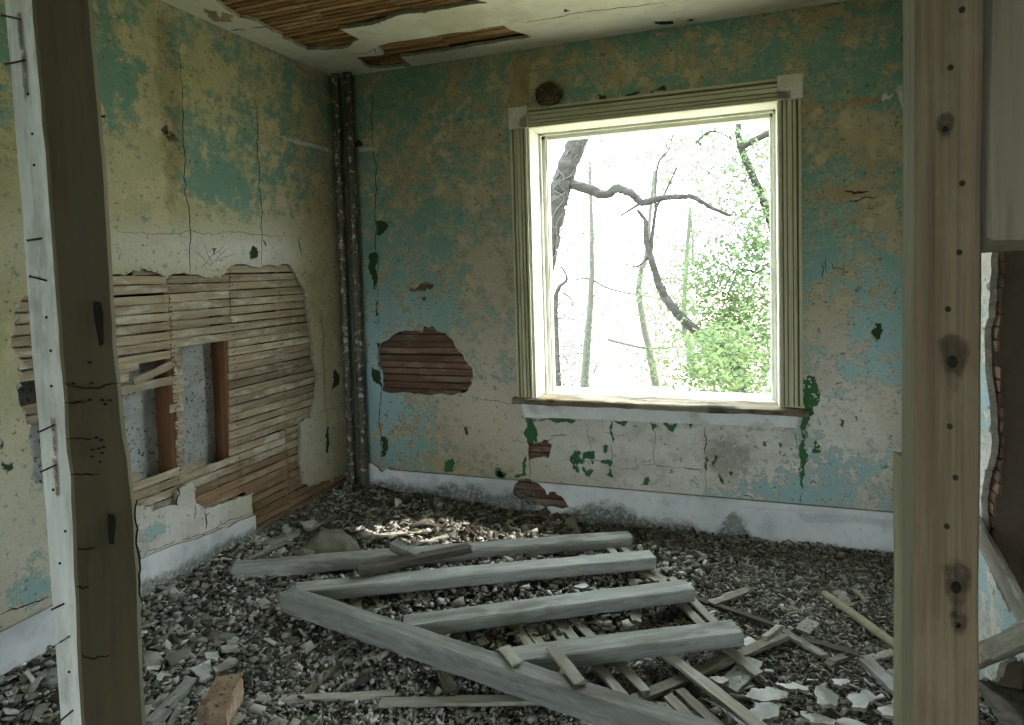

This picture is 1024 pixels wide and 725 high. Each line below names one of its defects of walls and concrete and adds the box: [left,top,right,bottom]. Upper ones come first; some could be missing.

flaking render [204,0,468,51]
flaking render [360,25,523,69]
crack [114,42,231,269]
crack [247,104,302,267]
flaking render [11,296,44,484]
crack [146,488,251,553]
flaking render [113,246,348,532]
flaking render [371,327,474,395]
flaking render [494,417,577,506]
crack [512,427,722,483]
peeling [798,374,822,502]
flaking render [979,250,1024,592]